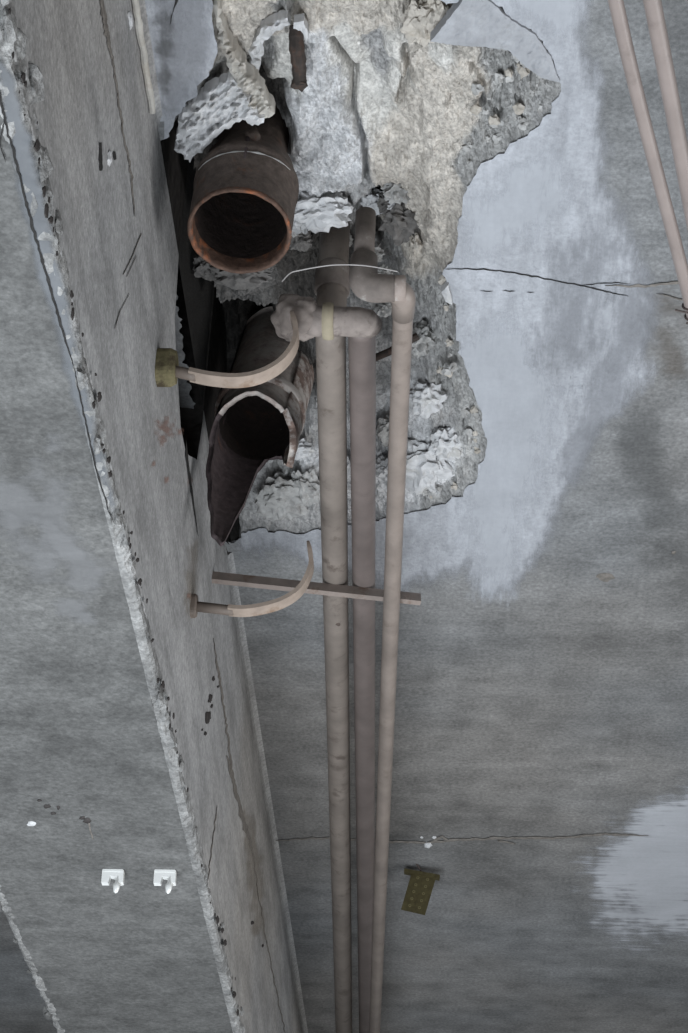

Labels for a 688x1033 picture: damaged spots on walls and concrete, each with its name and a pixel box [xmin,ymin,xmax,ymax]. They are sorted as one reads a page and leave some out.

spalling [174,0,561,545]
crack [445,268,629,297]